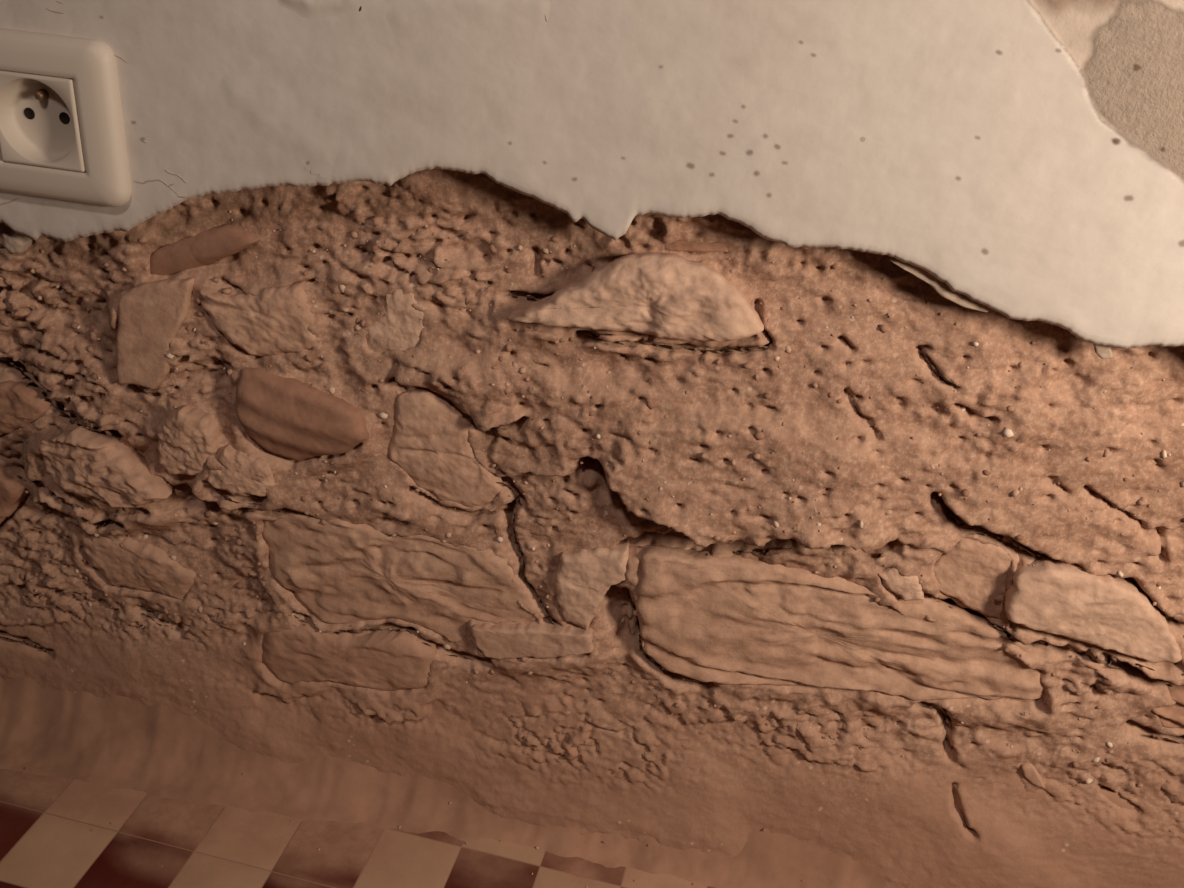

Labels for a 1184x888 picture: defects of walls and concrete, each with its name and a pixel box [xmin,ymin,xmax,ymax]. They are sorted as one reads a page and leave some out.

peeling [1029,0,1184,180]
spalling [0,223,34,254]
spalling [889,259,989,312]
spalling [1093,344,1113,359]
spalling [916,346,953,384]
spalling [69,417,116,436]
spalling [733,547,792,557]
spalling [997,537,1042,558]
spalling [1061,644,1123,666]
spalling [923,704,951,729]
spalling [1021,763,1045,788]